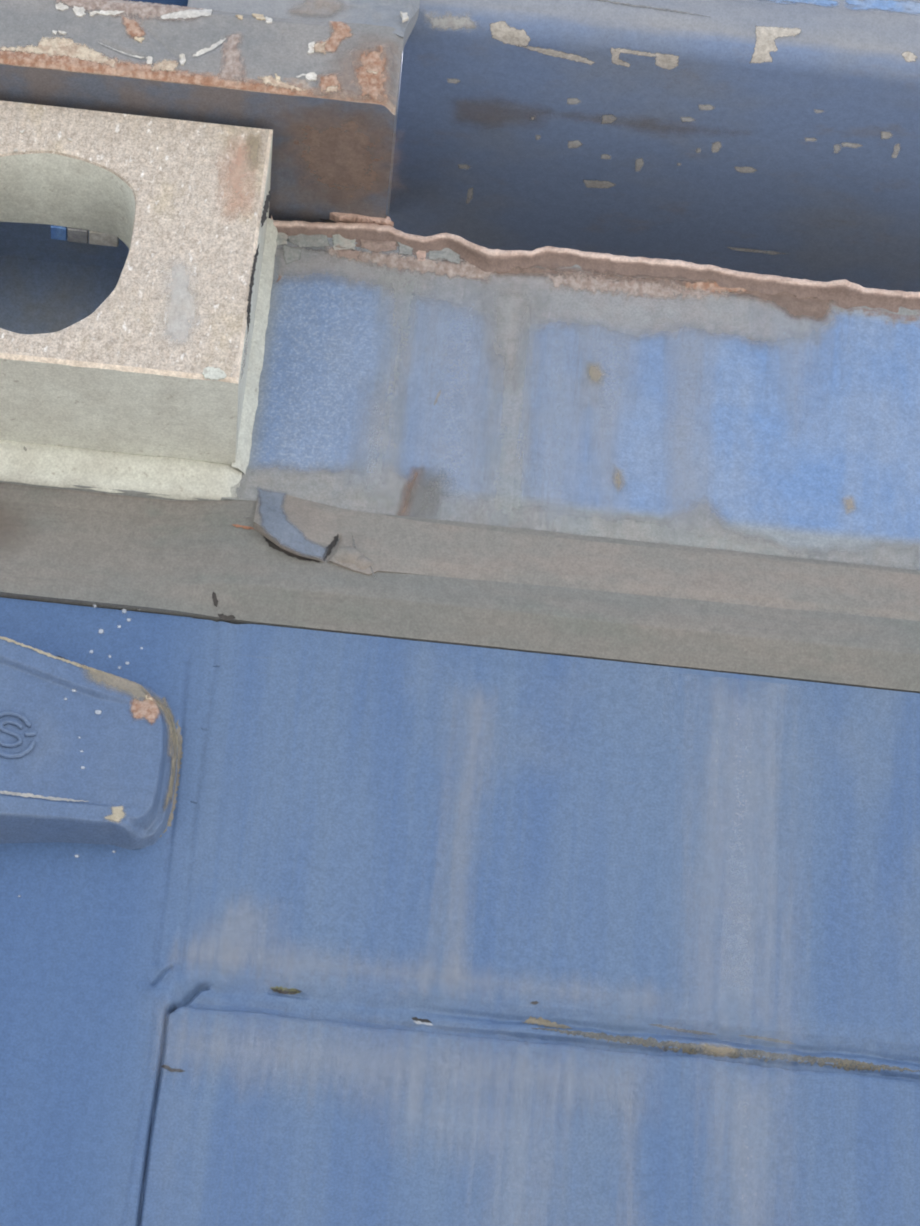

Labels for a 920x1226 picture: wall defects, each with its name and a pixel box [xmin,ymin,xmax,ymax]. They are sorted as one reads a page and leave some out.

peeling [55,0,212,20]
peeling [236,14,272,24]
peeling [1,30,116,67]
peeling [146,53,186,71]
peeling [490,21,595,65]
peeling [611,48,679,70]
peeling [751,26,801,63]
peeling [902,51,917,62]
peeling [258,72,317,91]
corrosion [329,246,830,319]
damp [239,247,918,570]
peeling [258,489,326,558]